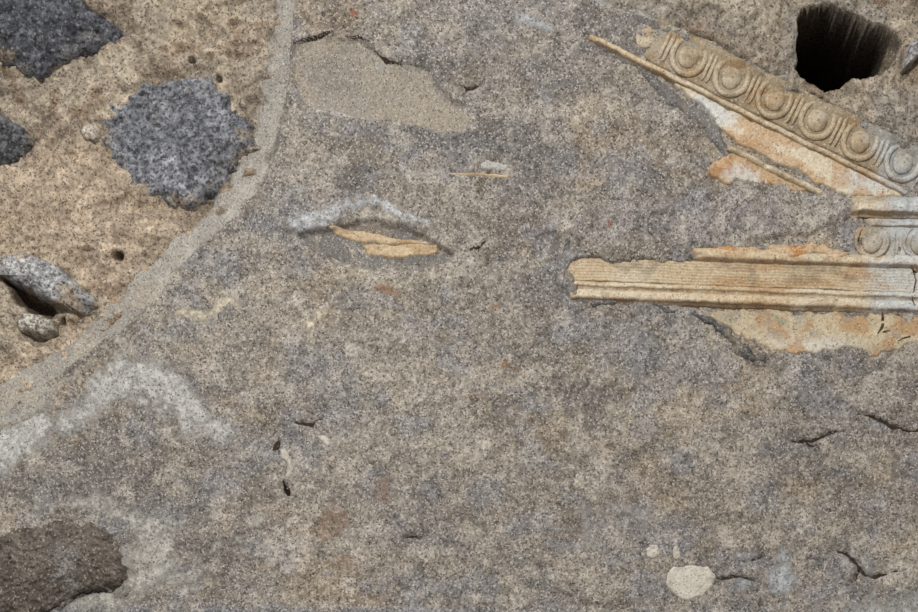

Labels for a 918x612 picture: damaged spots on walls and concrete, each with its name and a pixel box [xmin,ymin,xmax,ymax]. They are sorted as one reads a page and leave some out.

spalling [185,55,198,66]
spalling [213,72,225,85]
flaking render [293,31,468,133]
peeling [450,160,509,178]
flaking render [708,153,806,192]
spalling [108,247,127,263]
flaking render [300,224,450,269]
spalling [0,276,68,327]
crack [792,414,918,447]
crack [831,549,897,585]